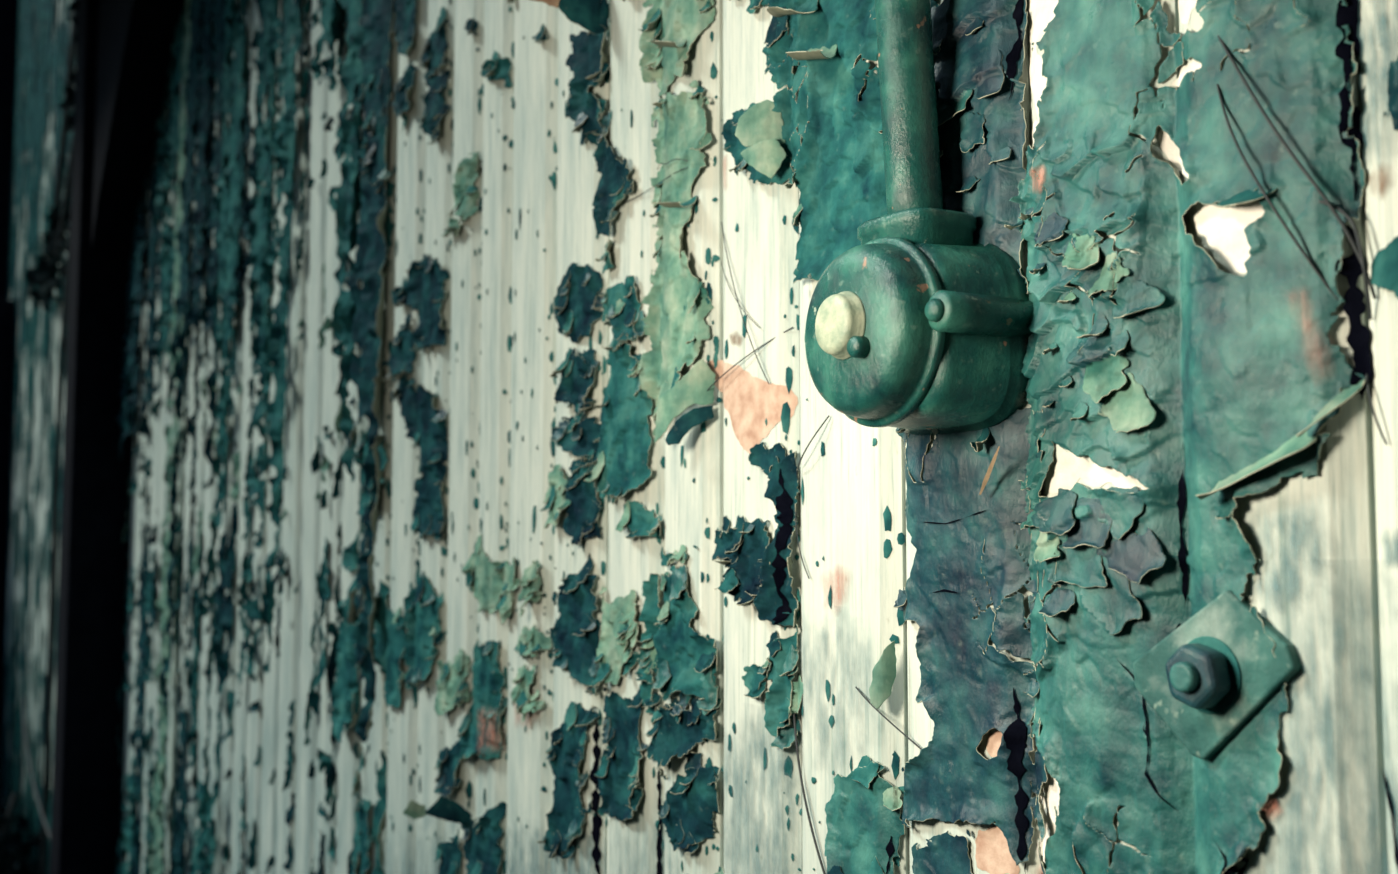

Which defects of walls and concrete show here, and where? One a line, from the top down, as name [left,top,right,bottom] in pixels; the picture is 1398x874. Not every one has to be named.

peeling [1383,58,1398,131]
peeling [1371,236,1398,298]
peeling [116,0,887,874]
peeling [824,0,1366,874]
crack [1116,658,1176,810]
crack [1213,839,1250,874]